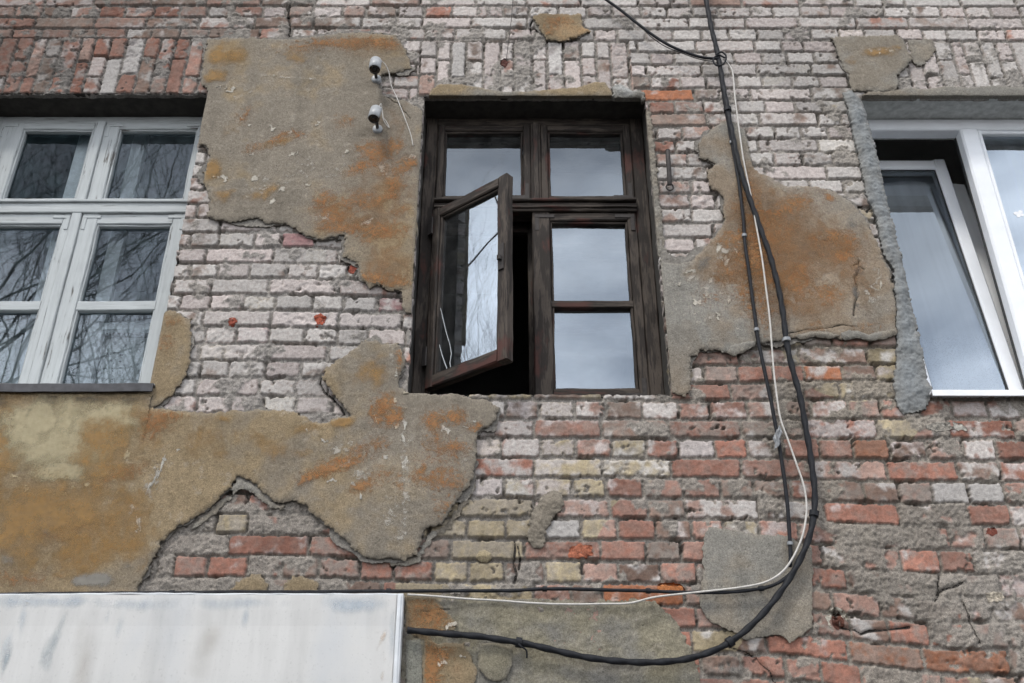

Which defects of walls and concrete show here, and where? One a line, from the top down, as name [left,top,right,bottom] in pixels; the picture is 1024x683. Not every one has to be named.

flaking render [533,13,591,44]
flaking render [830,35,1024,99]
flaking render [196,30,612,315]
flaking render [658,121,898,398]
flaking render [0,310,501,593]
spalling [568,543,594,559]
spalling [657,582,685,591]
spalling [825,607,848,630]
crack [934,576,981,644]